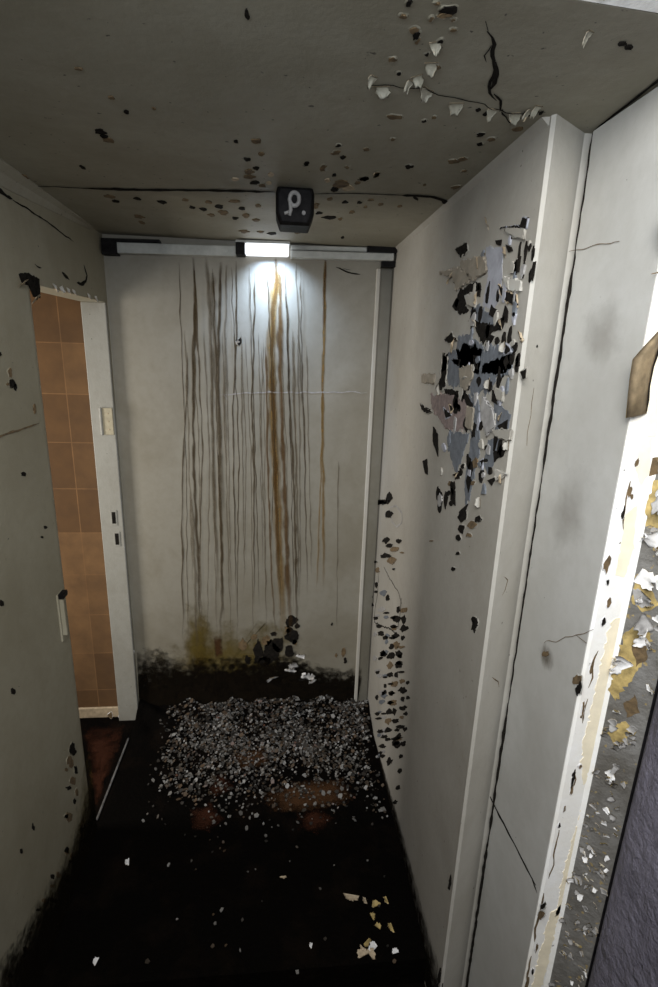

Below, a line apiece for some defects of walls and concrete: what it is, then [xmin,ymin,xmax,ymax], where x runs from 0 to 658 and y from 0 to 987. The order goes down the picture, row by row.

crack [372,21,545,123]
crack [0,423,39,438]
leakage [137,268,361,706]
rust [265,265,299,603]
rust [317,260,326,567]
spalling [378,492,394,519]
peeling [372,537,410,816]
peeling [420,216,537,572]
crack [465,79,658,987]
peeling [525,332,658,987]